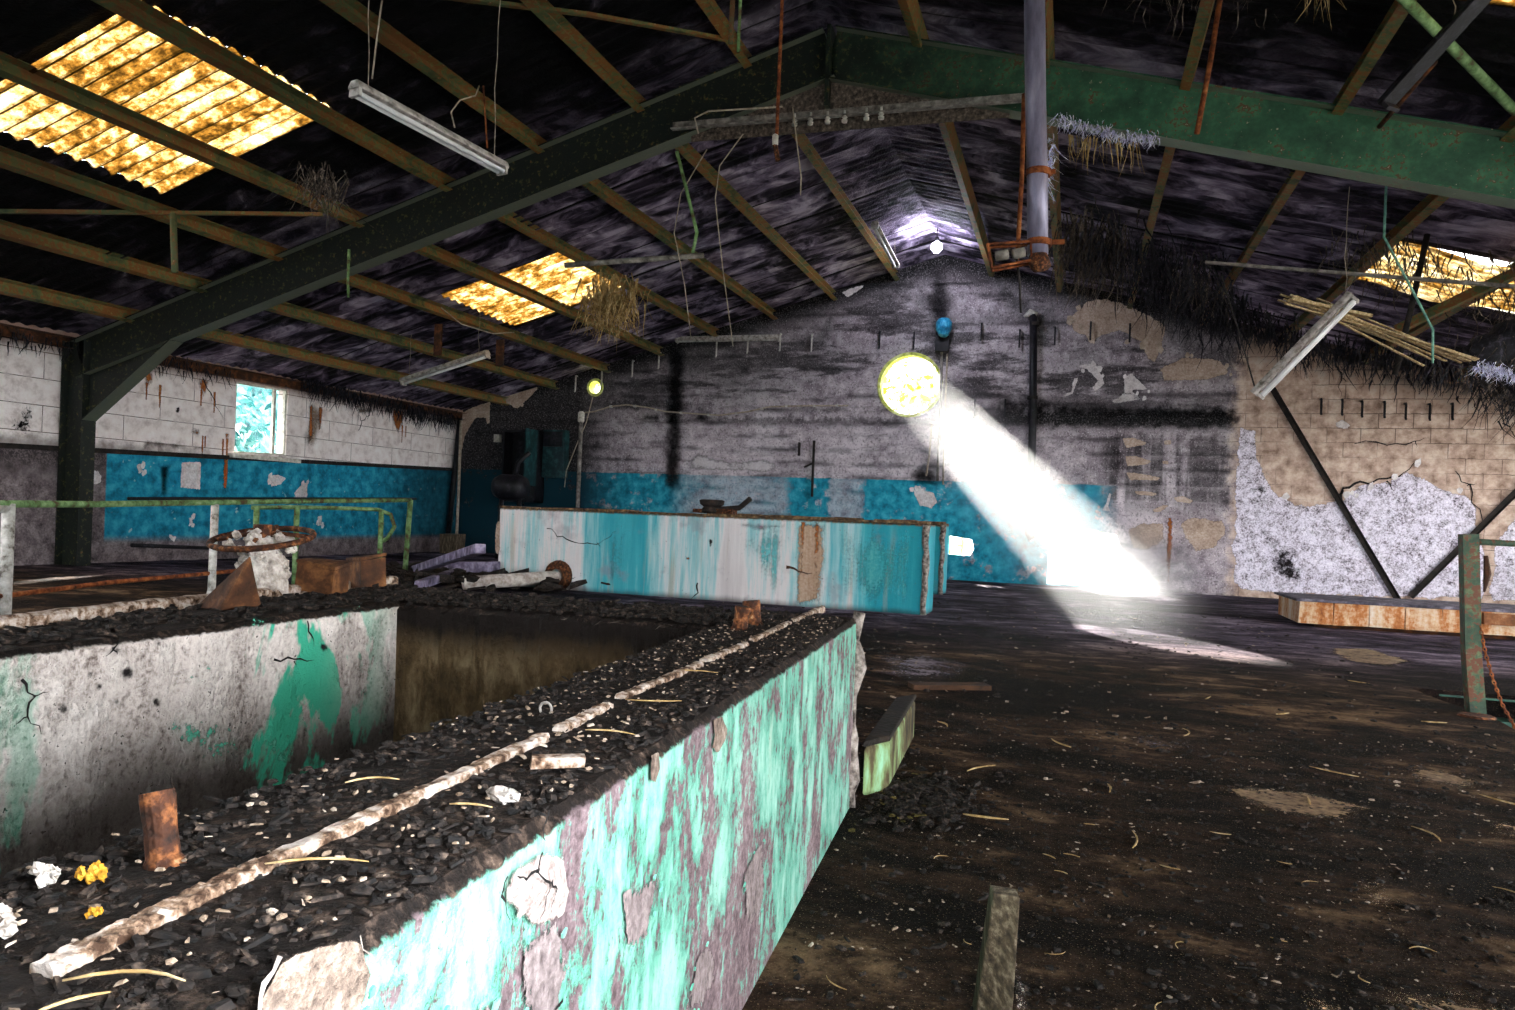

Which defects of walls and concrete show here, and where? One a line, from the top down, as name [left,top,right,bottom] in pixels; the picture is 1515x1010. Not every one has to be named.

flaking render [1064,299,1232,403]
corrosion [145,373,162,408]
corrosion [199,379,216,413]
peeling [267,473,309,497]
flaking render [1123,438,1226,551]
peeling [1343,482,1374,498]
spalling [712,717,727,752]
spalling [651,752,660,782]
spalling [486,785,521,805]
peeling [623,874,664,951]
peeling [523,921,570,1010]
peeling [687,941,714,1010]